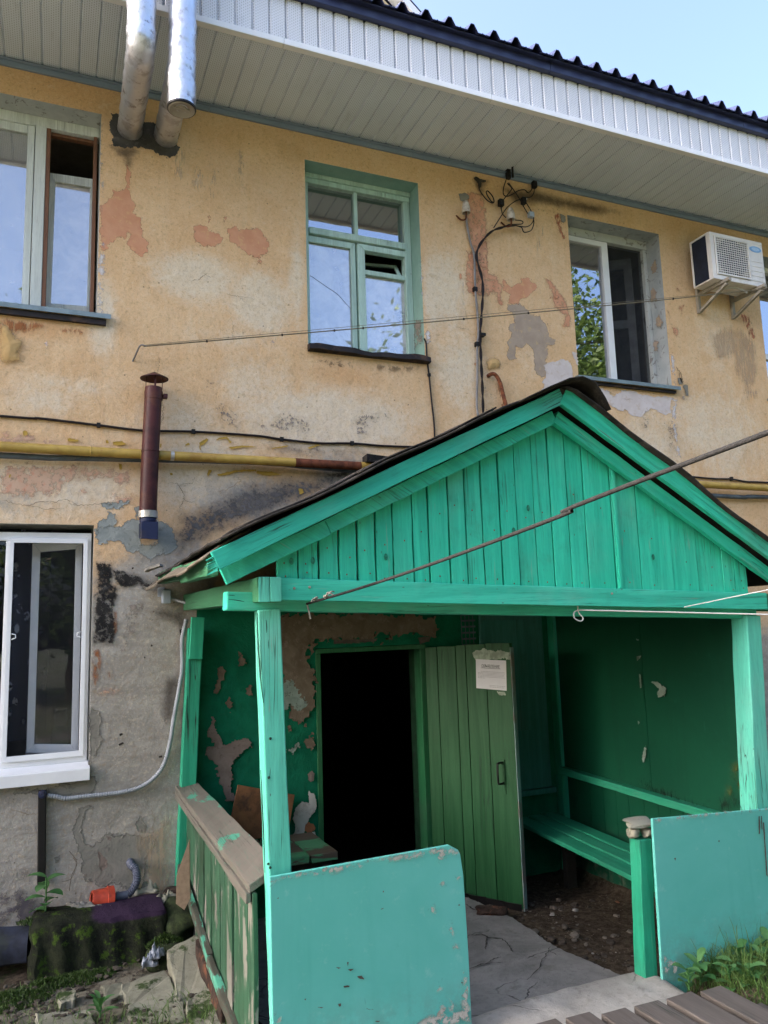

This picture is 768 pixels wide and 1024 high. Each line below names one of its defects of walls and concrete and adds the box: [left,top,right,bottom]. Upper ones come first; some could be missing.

peeling [99,165,149,257]
peeling [193,216,269,264]
peeling [459,177,578,390]
peeling [601,378,688,417]
peeling [0,463,129,497]
damp [179,472,348,548]
rust [295,458,362,470]
damp [93,562,152,643]
peeling [281,612,439,755]
peeling [205,717,252,801]
crack [466,904,513,969]
peeling [419,977,470,1024]